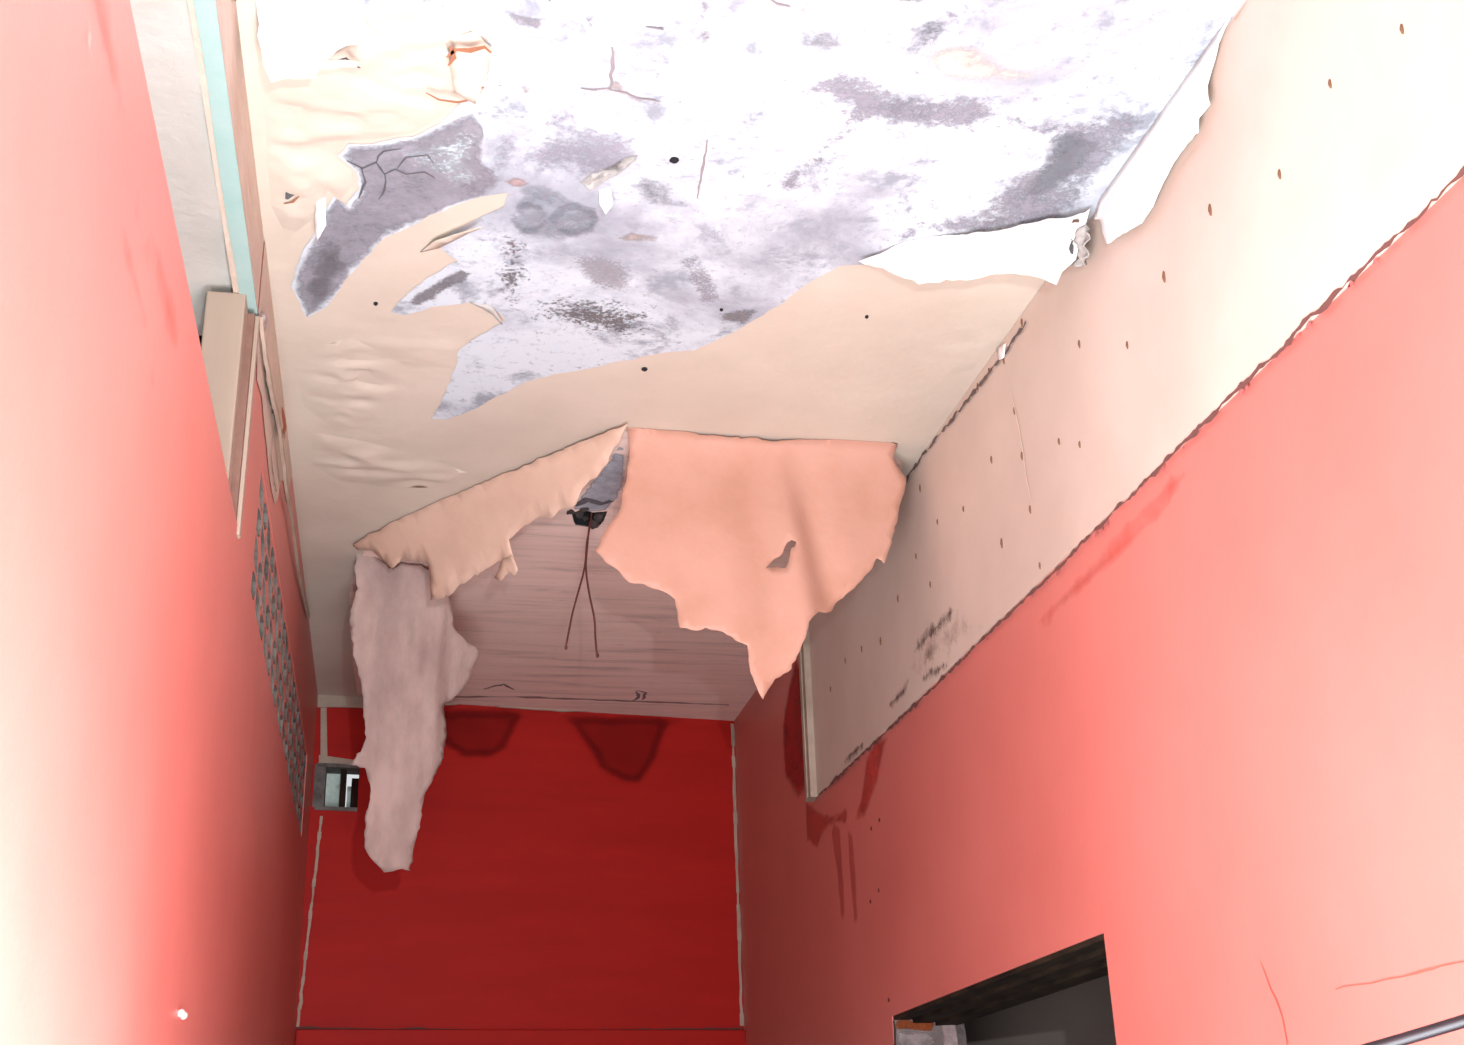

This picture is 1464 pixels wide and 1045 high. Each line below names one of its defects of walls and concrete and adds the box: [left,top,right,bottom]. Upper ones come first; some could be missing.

water stain [812,75,990,126]
crack [347,149,435,199]
water stain [298,117,495,314]
water stain [502,187,594,304]
mould [534,259,652,335]
mould [723,310,754,324]
peeling [291,0,1245,419]
water stain [939,117,1134,231]
spalling [362,551,429,570]
spalling [446,431,757,721]
spalling [766,540,796,568]
spalling [349,574,363,697]